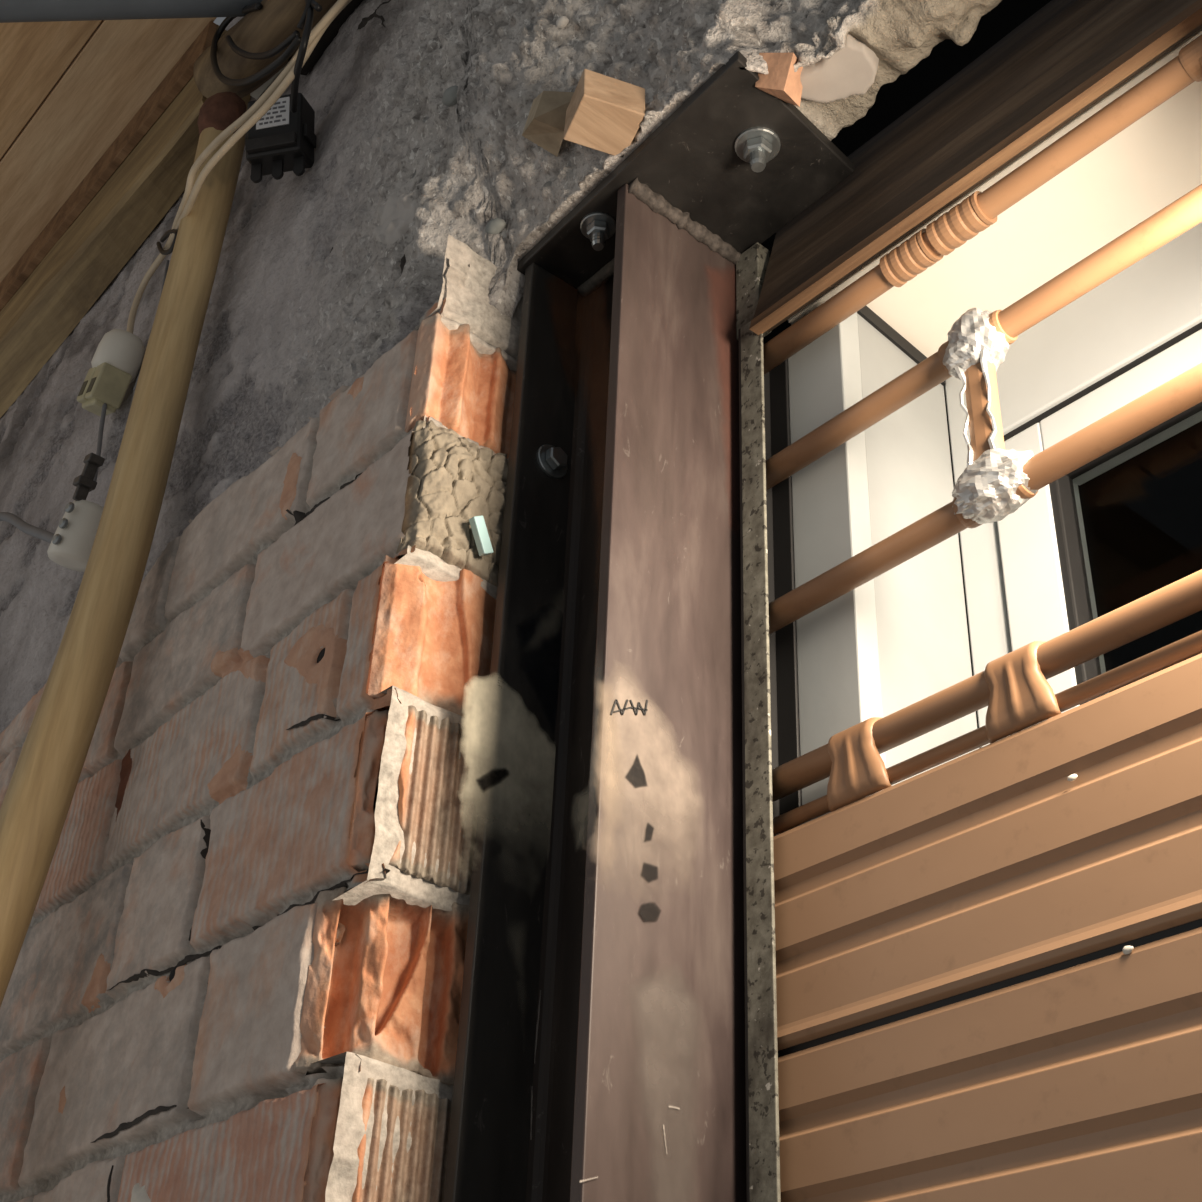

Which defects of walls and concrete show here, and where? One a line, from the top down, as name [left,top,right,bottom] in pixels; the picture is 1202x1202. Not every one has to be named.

spalling [831,0,1051,157]
spalling [761,233,776,255]
spalling [763,319,791,344]
crack [286,472,363,526]
crack [286,714,340,730]
crack [200,820,211,859]
crack [252,868,390,931]
crack [109,928,222,990]
crack [91,1105,189,1202]